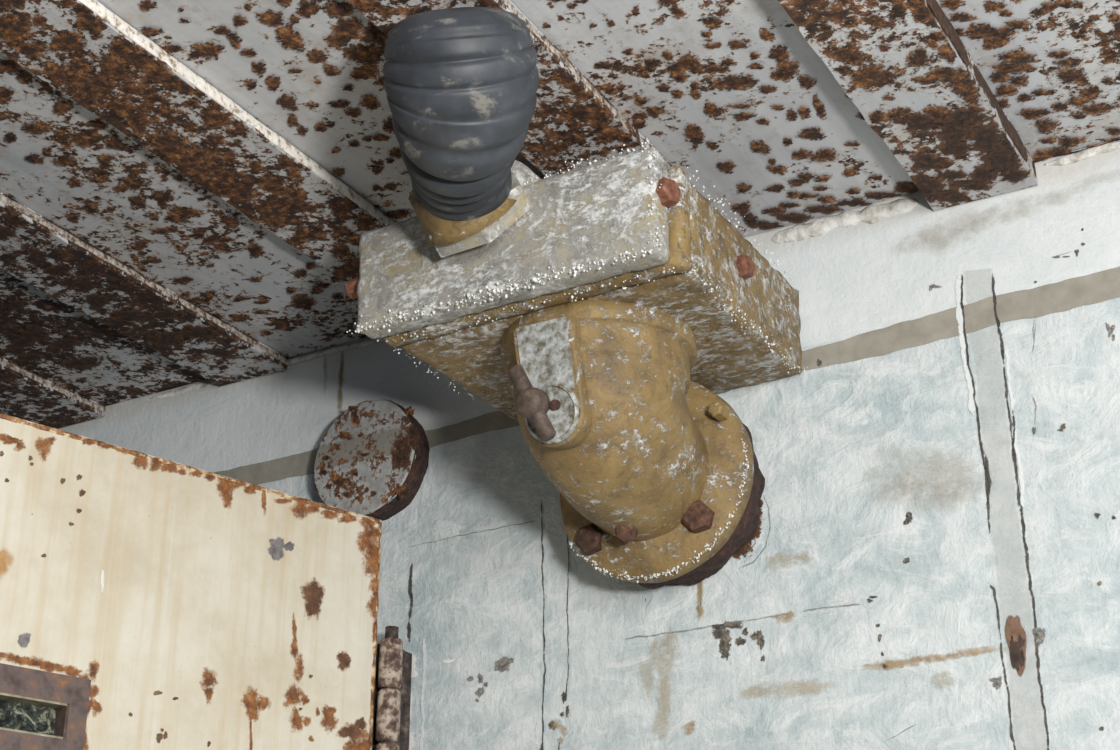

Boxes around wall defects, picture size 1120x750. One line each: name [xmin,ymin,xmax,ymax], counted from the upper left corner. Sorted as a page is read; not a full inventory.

rust [0,0,413,312]
rust [346,0,1120,399]
rust [22,247,239,363]
rust [0,359,420,641]
crack [955,273,1050,750]
rust [0,652,102,715]
rust [202,668,217,703]
rust [243,687,269,750]
rust [283,578,373,750]
crack [407,501,569,750]
crack [629,586,858,639]
rust [1005,616,1027,677]